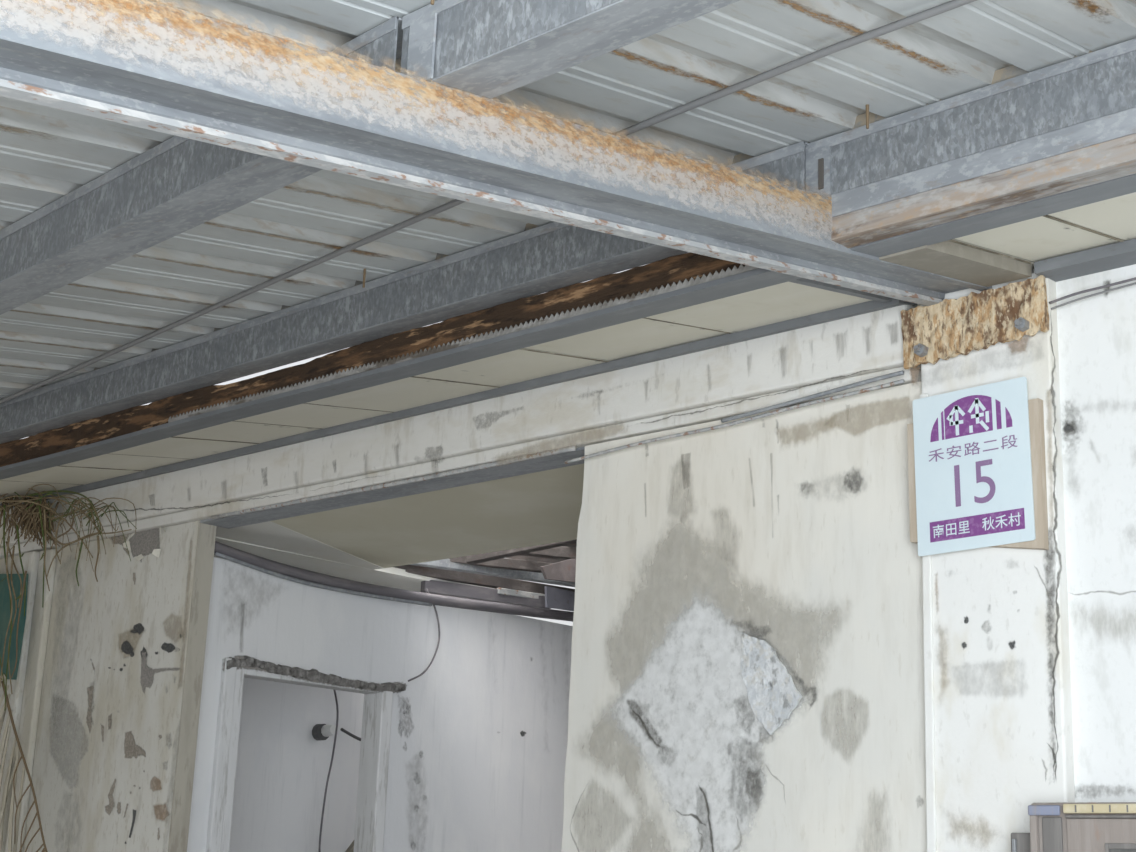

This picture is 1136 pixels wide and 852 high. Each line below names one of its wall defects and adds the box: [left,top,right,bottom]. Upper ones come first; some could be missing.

corrosion [0,0,1136,248]
corrosion [205,222,381,257]
corrosion [158,259,291,282]
corrosion [10,310,156,329]
crack [1046,322,1062,776]
peeling [141,652,180,693]
flaking render [223,655,406,693]
damp [628,701,661,747]